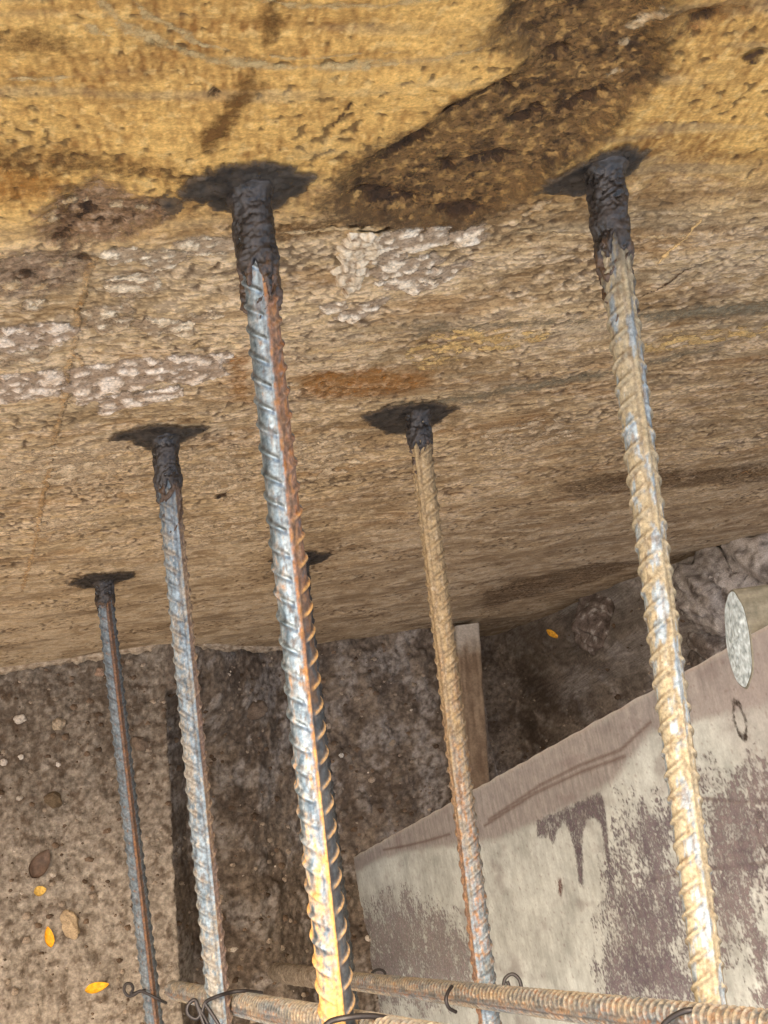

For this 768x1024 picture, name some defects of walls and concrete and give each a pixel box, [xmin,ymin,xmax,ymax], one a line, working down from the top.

damp [0,152,186,183]
damp [275,94,632,241]